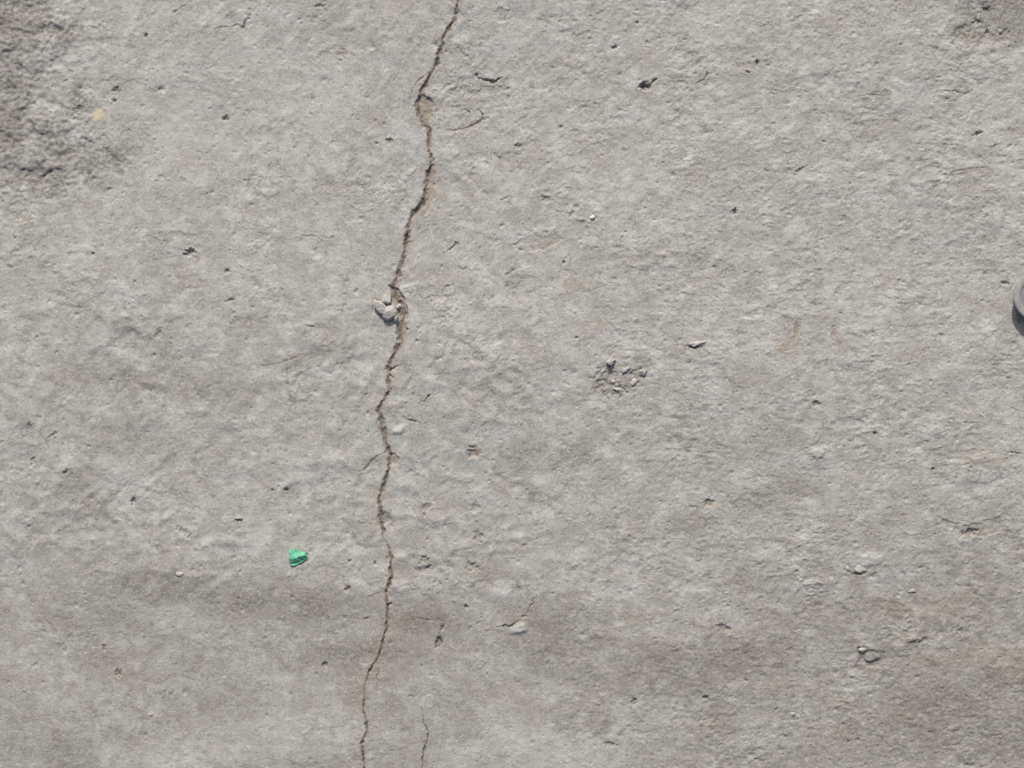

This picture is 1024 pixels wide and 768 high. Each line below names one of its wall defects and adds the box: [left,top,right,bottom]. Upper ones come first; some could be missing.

crack [324,0,490,768]